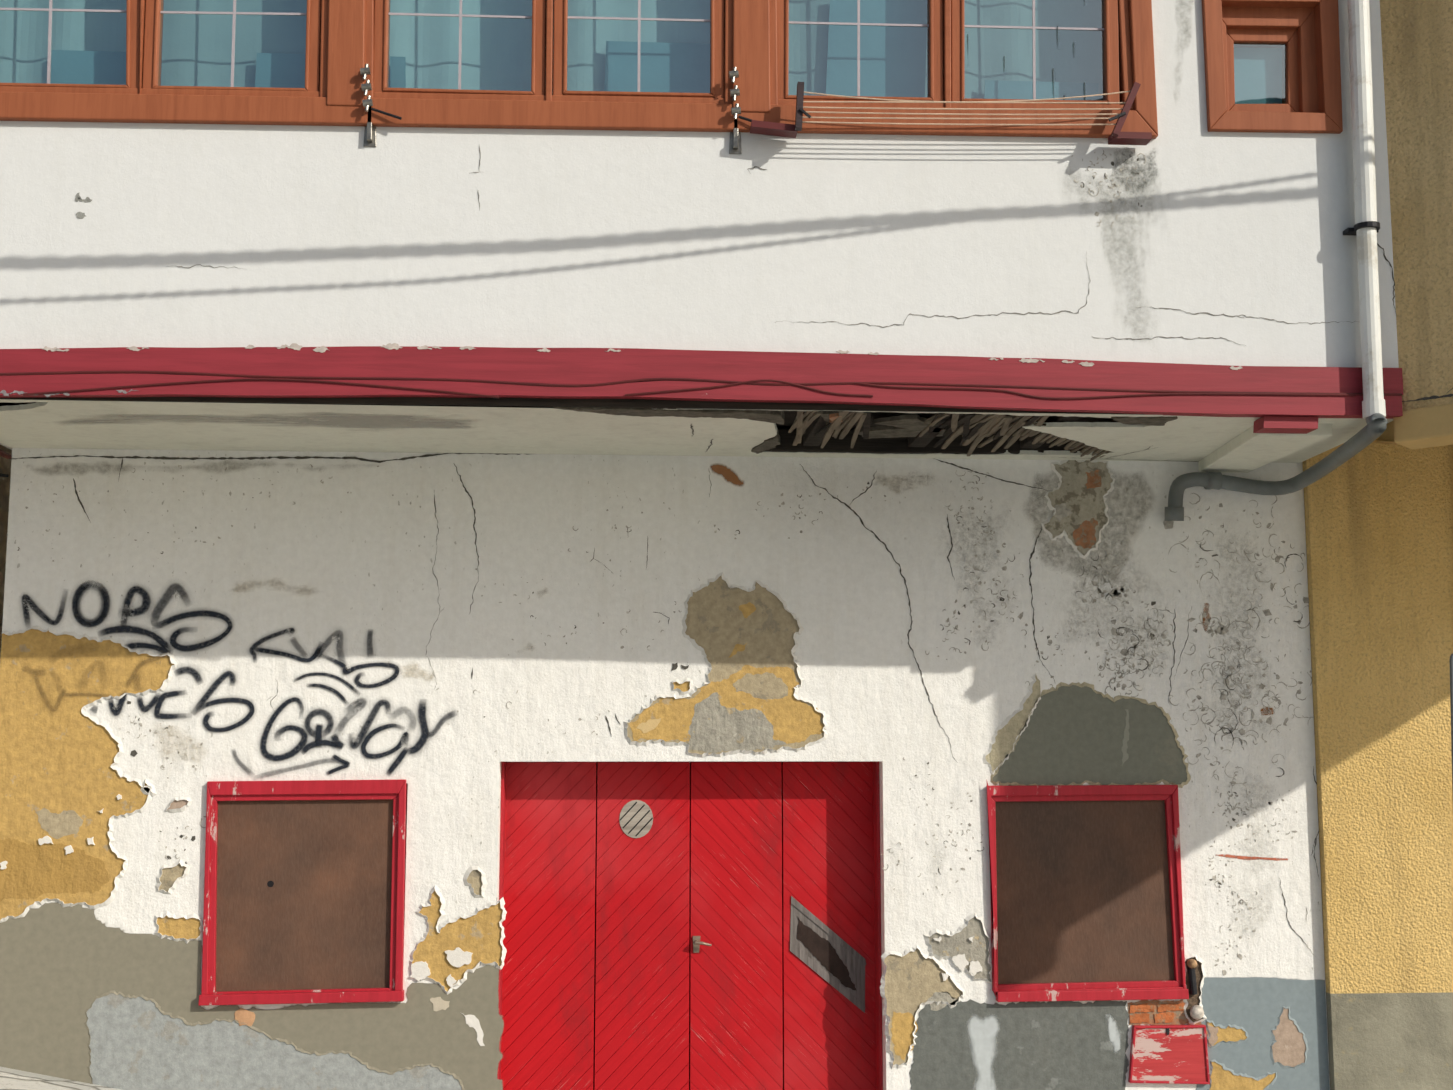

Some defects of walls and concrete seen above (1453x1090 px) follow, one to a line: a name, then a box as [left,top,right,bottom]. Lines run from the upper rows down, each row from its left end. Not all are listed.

damp [75,192,92,219]
crack [775,253,1359,346]
crack [1377,243,1396,312]
peeling [0,626,192,923]
crack [9,453,520,689]
peeling [623,572,829,758]
crack [800,464,958,763]
spalling [982,673,1042,774]
spalling [1041,460,1116,559]
peeling [409,866,507,1046]
peeling [880,913,992,1070]